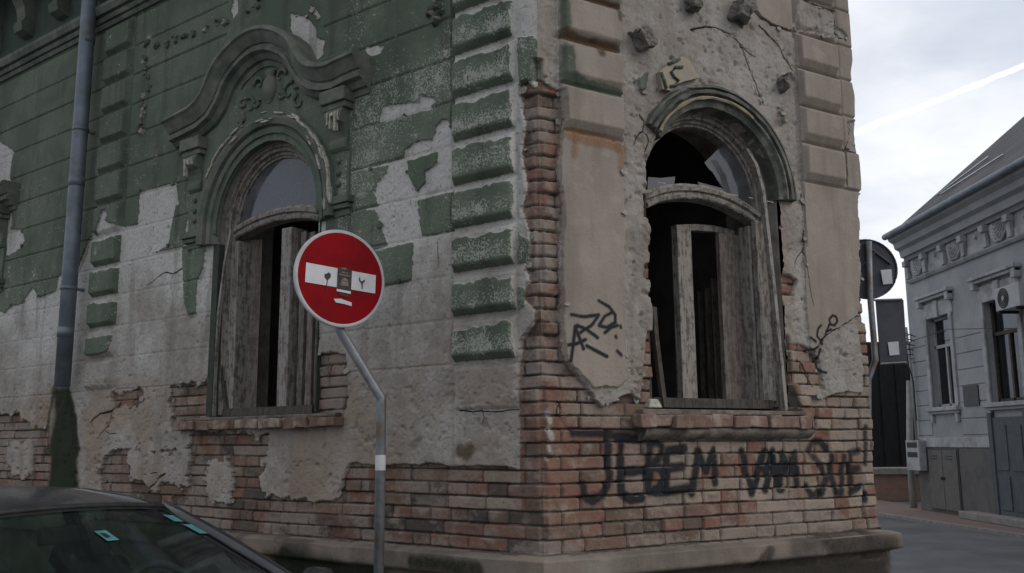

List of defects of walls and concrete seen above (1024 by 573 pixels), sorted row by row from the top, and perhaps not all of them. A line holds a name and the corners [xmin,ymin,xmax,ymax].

crack [689,9,797,106]
peeling [5,220,24,258]
peeling [0,274,62,338]
crack [145,266,183,299]
flaking render [97,0,895,556]
flaking render [0,410,52,486]
leakage [48,387,80,488]
crack [88,400,123,442]